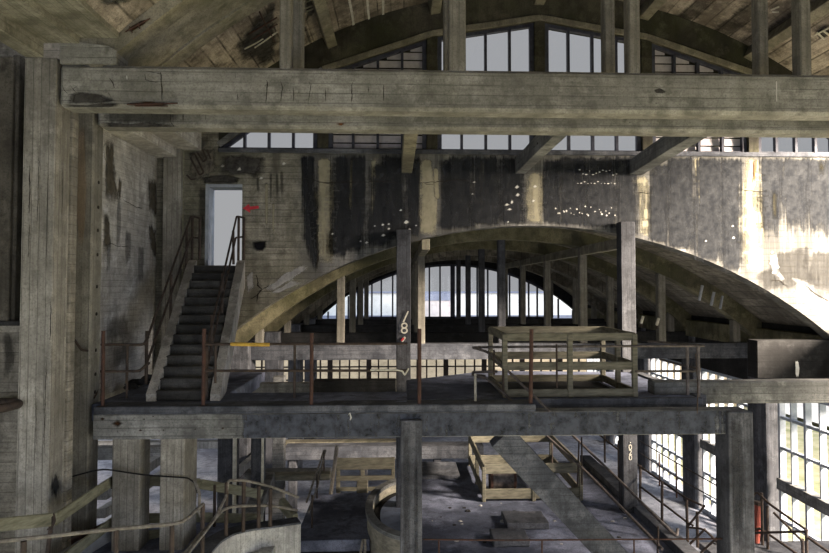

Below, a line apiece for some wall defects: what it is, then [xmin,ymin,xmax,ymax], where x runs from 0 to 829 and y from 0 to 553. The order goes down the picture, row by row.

spalling [236,5,278,65]
leakage [301,154,829,270]
peeling [270,267,305,293]
peeling [770,251,783,277]
peeling [798,283,829,321]